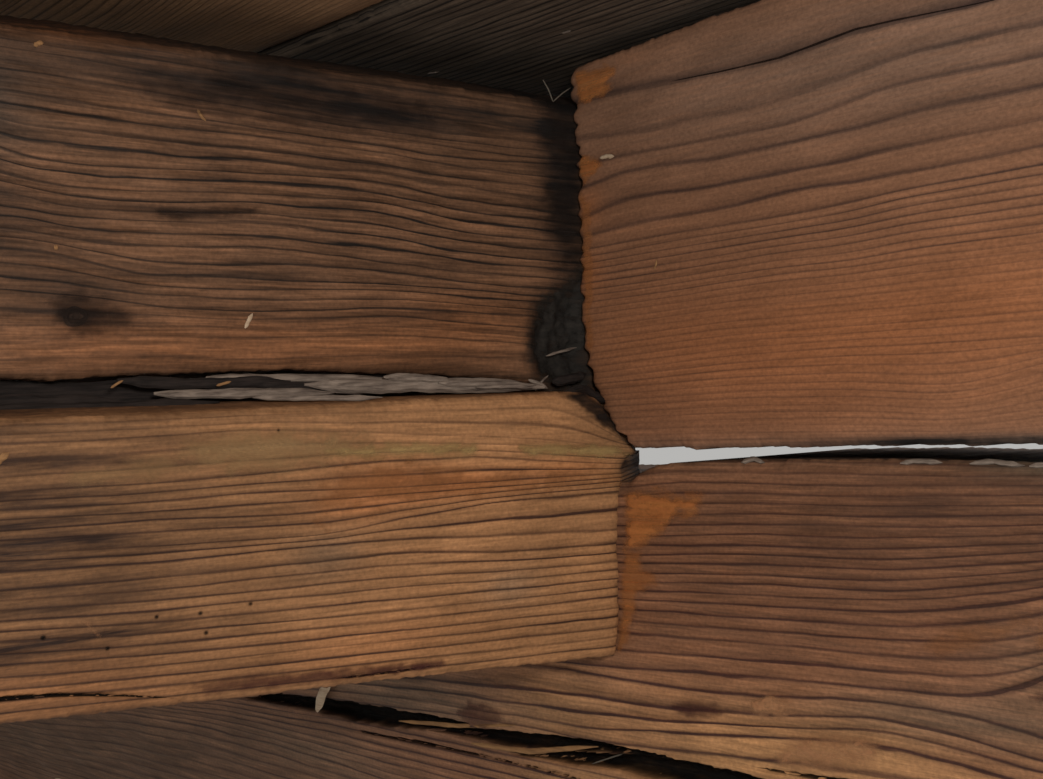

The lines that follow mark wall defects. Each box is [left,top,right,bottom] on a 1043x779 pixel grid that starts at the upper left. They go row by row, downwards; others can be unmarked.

crack [0,693,167,701]
crack [254,666,846,779]